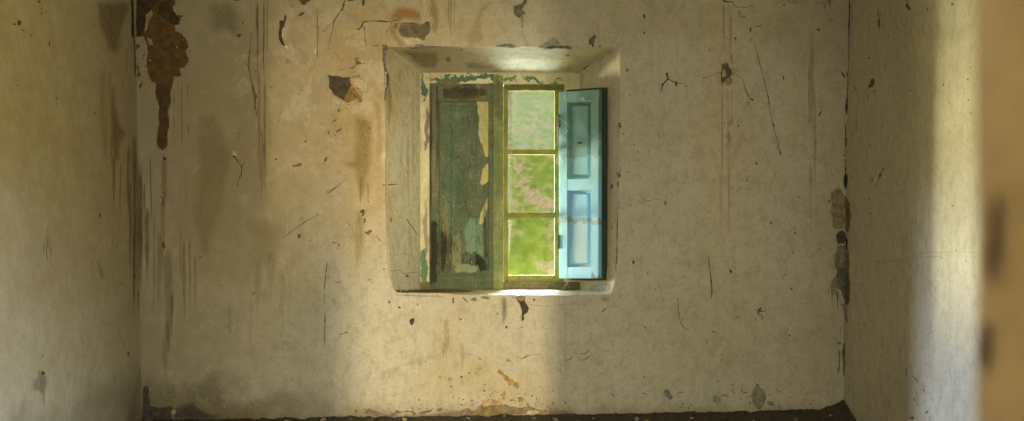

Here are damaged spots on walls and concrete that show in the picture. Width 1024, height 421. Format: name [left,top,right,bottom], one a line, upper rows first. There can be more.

flaking render [134,0,191,161]
flaking render [323,58,367,165]
flaking render [397,20,439,50]
crack [661,0,781,156]
flaking render [719,61,734,86]
flaking render [828,187,862,307]
flaking render [512,295,541,328]
flaking render [353,369,567,418]